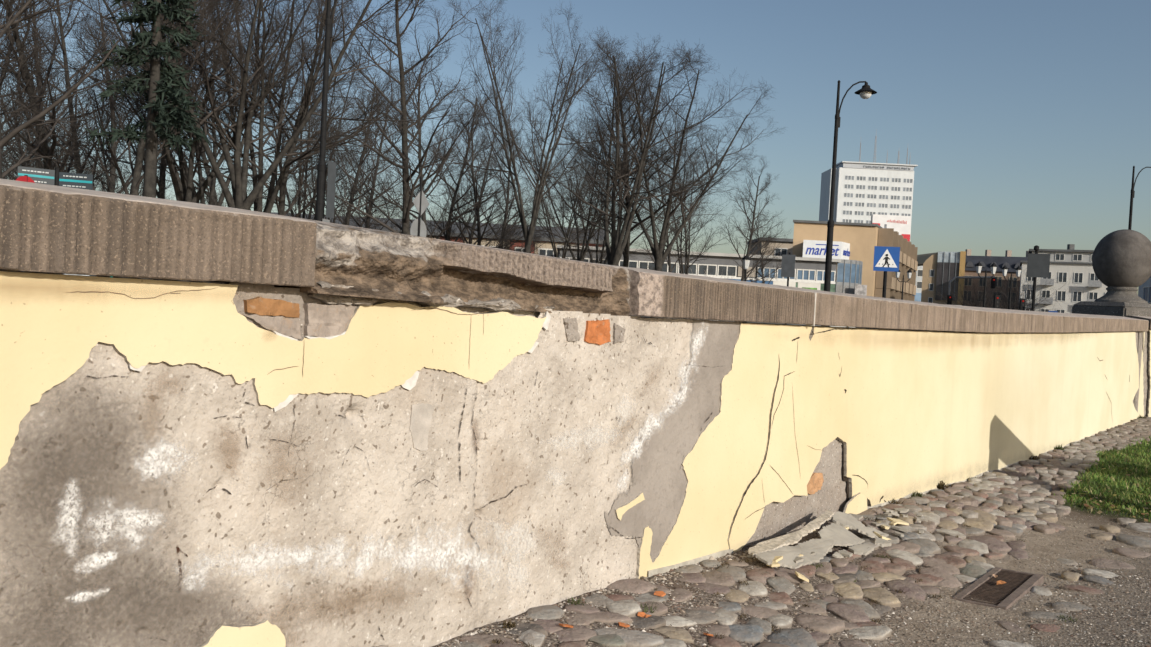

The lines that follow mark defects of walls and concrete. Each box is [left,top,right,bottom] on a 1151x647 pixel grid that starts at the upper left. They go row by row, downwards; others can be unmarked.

crack [68,288,214,299]
flaking render [0,209,743,647]
crack [729,328,856,538]
flaking render [745,438,867,546]